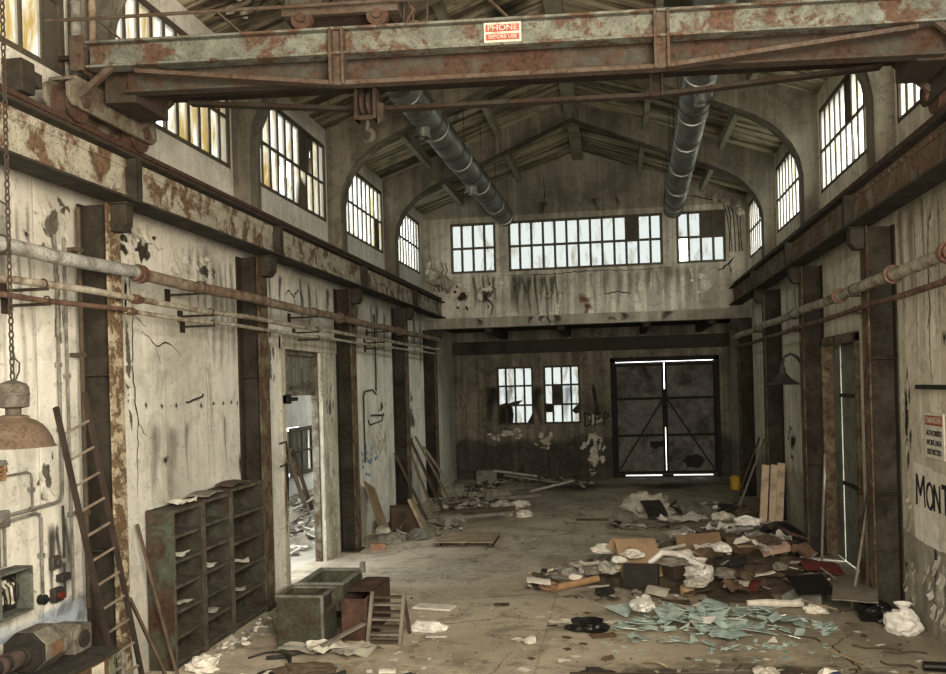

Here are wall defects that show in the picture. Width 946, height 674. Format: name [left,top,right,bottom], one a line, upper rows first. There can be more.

crack [129,278,181,493]
water stain [466,277,562,322]